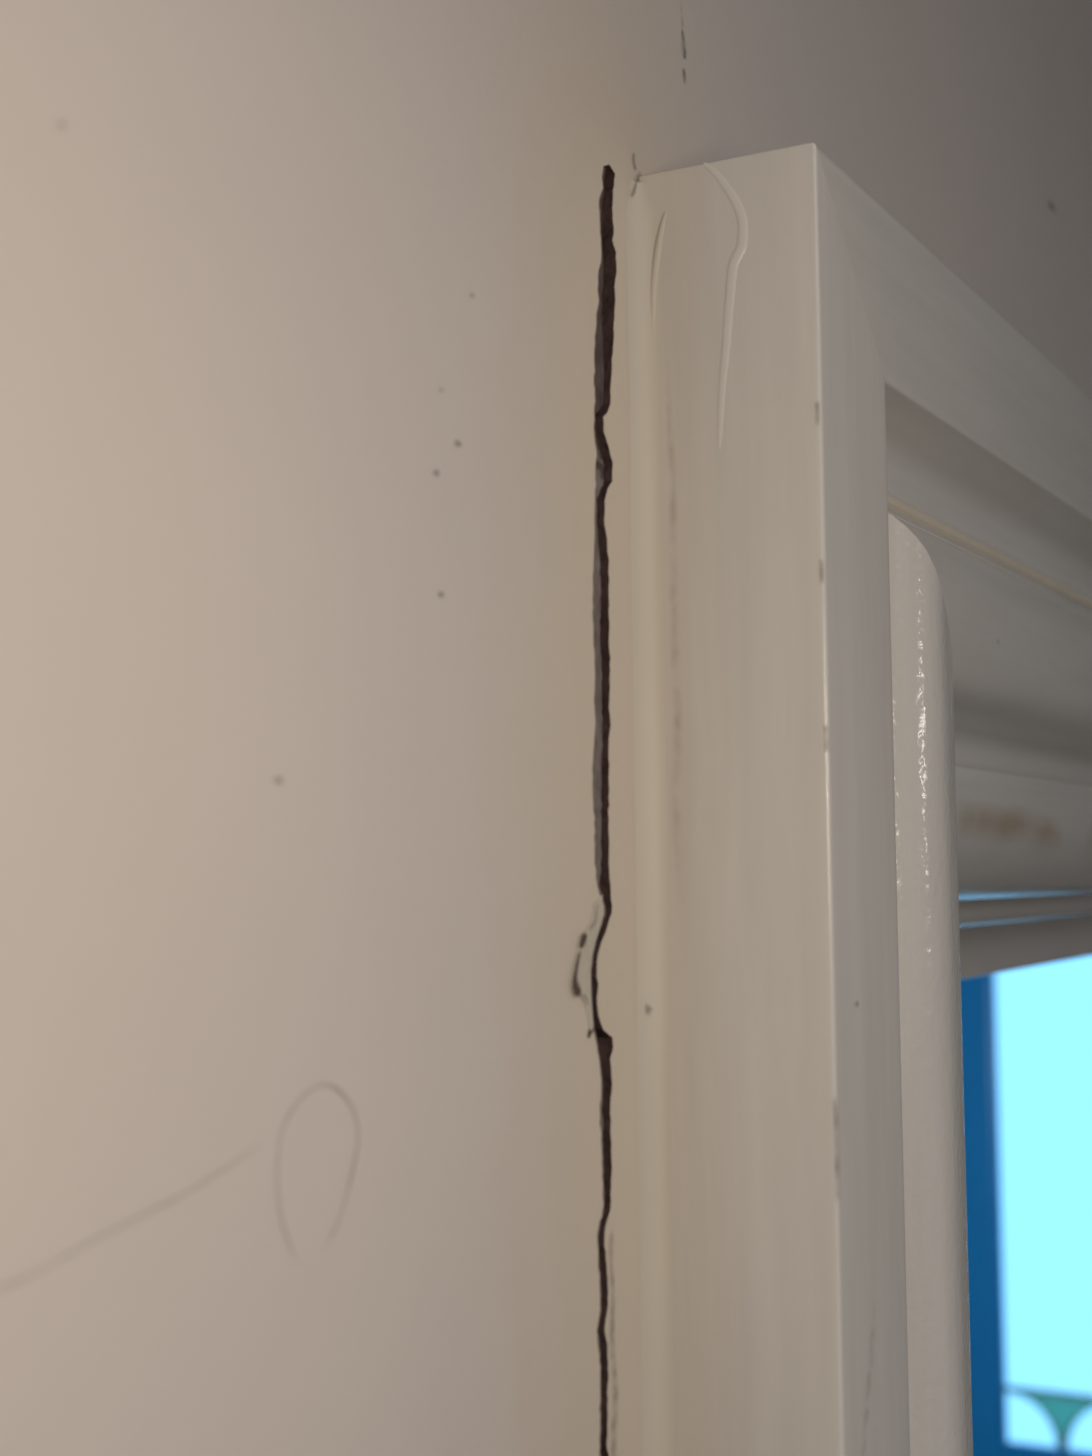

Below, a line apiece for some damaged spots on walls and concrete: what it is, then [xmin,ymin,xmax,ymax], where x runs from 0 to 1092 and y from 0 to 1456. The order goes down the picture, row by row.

crack [588,154,641,1456]